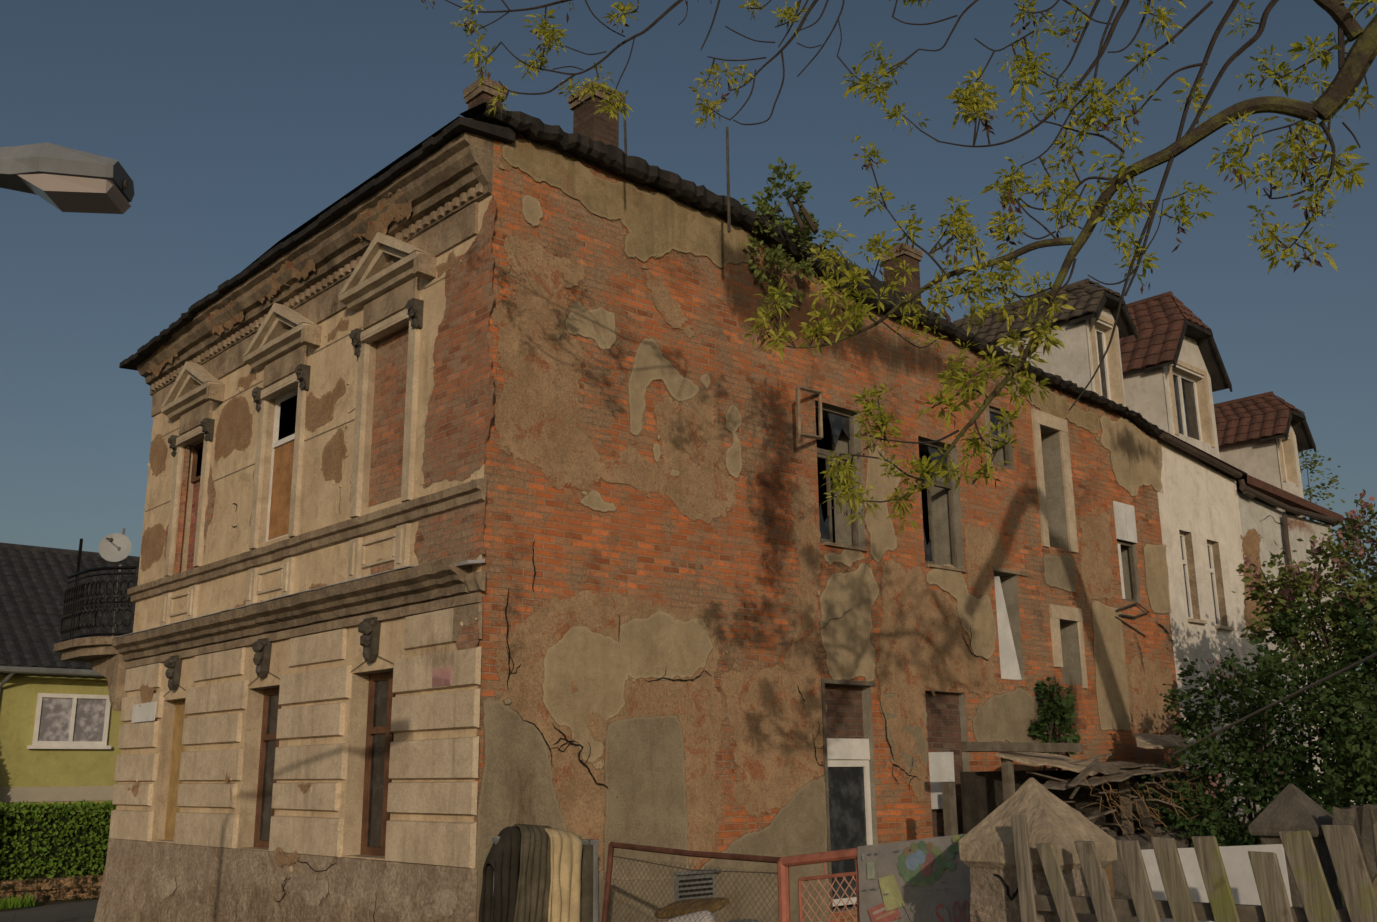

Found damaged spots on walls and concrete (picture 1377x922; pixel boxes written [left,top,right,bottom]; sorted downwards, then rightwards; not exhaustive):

spalling [420,138,760,523]
water stain [723,245,976,384]
spalling [147,434,167,476]
spalling [204,370,256,553]
spalling [305,378,352,499]
spalling [455,618,479,650]
crack [505,540,618,798]
spalling [475,444,1057,922]
crack [877,694,920,791]
flaking render [1043,509,1181,734]